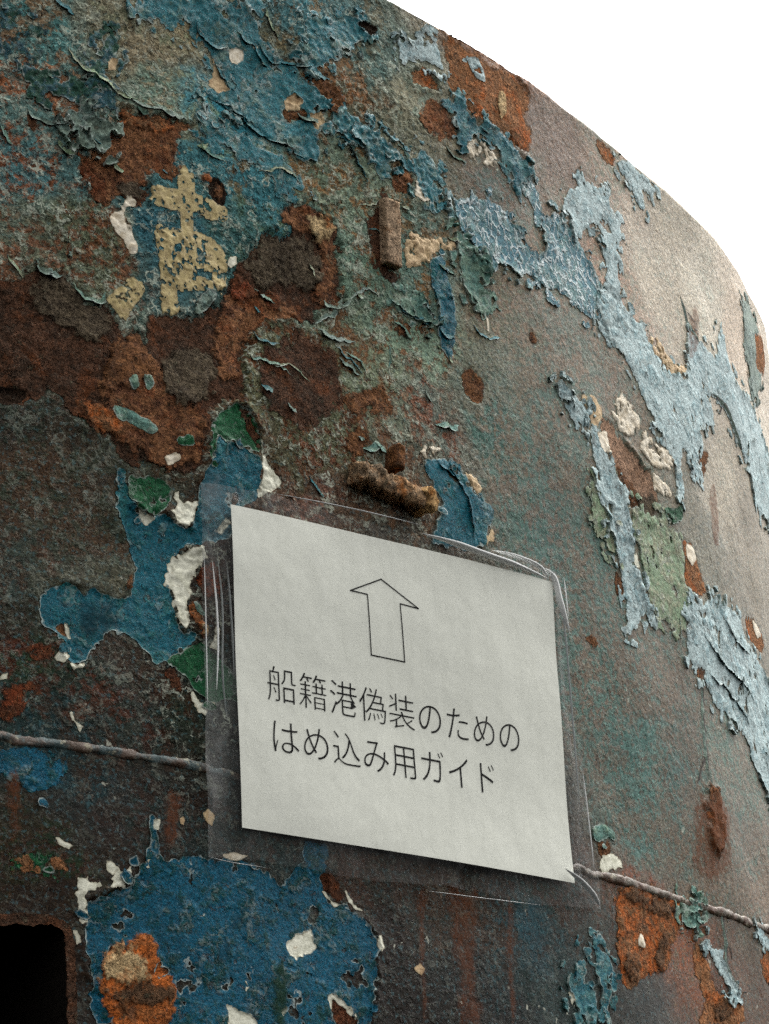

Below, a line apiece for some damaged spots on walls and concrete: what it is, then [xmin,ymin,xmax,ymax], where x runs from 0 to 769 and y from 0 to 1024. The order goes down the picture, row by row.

rust [411,35,532,152]
rust [365,165,413,283]
rust [0,203,394,475]
peeling [0,0,769,809]
rust [410,486,440,518]
rust [683,541,706,596]
rust [705,781,727,855]
rust [96,933,177,1024]
peeling [73,814,385,1024]
peeling [560,927,623,1024]
rust [614,883,682,990]